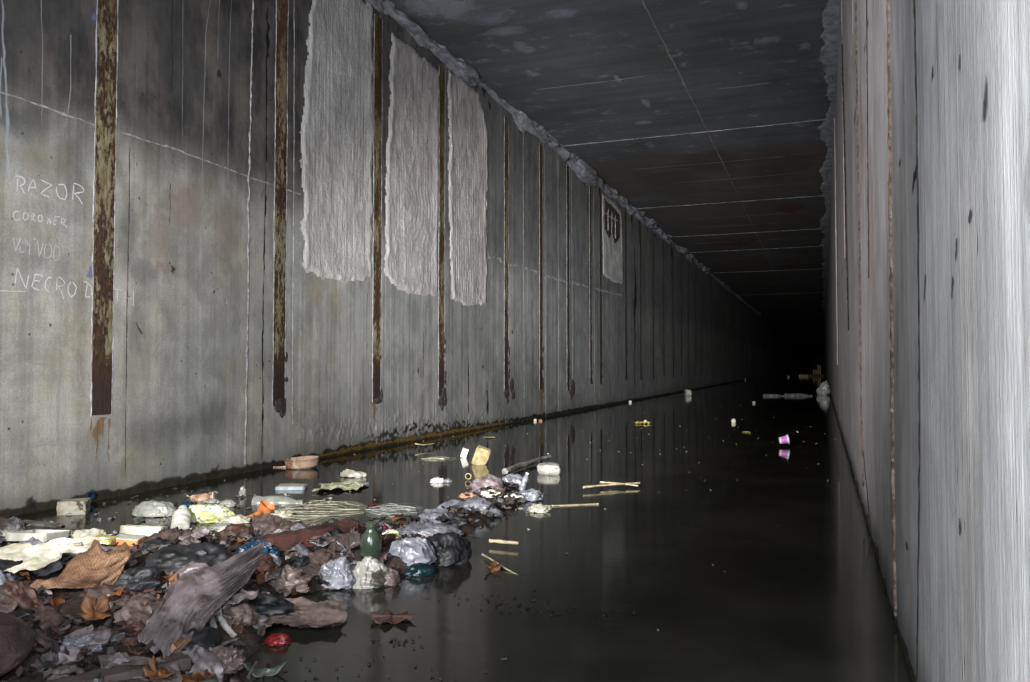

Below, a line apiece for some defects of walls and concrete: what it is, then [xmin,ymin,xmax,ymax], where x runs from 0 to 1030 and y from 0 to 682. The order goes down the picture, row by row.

spalling [604,199,620,243]
corrosion [90,417,111,449]